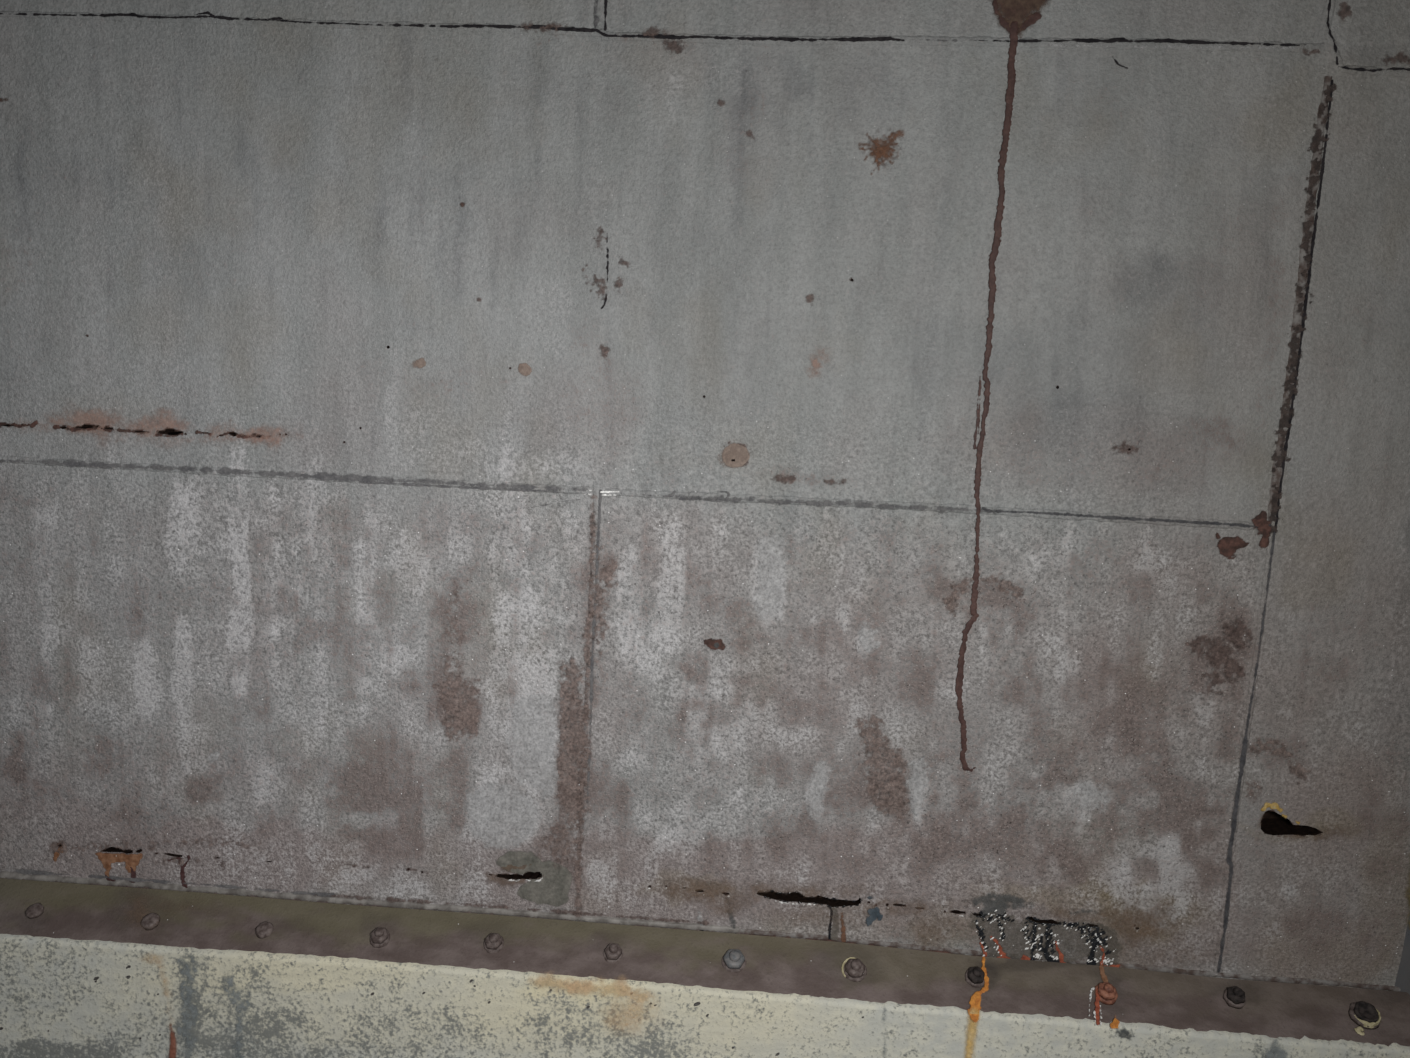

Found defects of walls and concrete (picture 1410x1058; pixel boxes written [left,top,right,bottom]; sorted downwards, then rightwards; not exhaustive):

corrosion [860,130,903,175]
corrosion [1269,83,1337,536]
corrosion [943,0,1048,772]
corrosion [0,420,271,439]
corrosion [1216,533,1249,559]
spalling [1260,810,1323,836]
spalling [101,847,182,857]
leakage [497,851,572,906]
leakage [866,896,883,926]
spalling [1028,916,1062,924]
leakage [973,894,1120,967]
corrosion [965,956,989,1058]